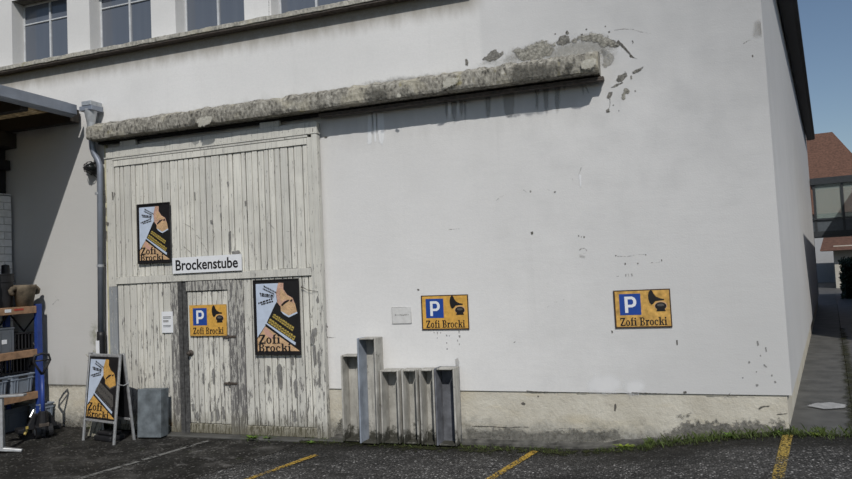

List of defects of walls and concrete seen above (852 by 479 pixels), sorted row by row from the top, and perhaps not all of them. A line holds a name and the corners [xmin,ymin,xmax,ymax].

flaking render [482,26,619,80]
peeling [606,67,643,113]
damp [466,428,620,443]
damp [661,415,785,439]